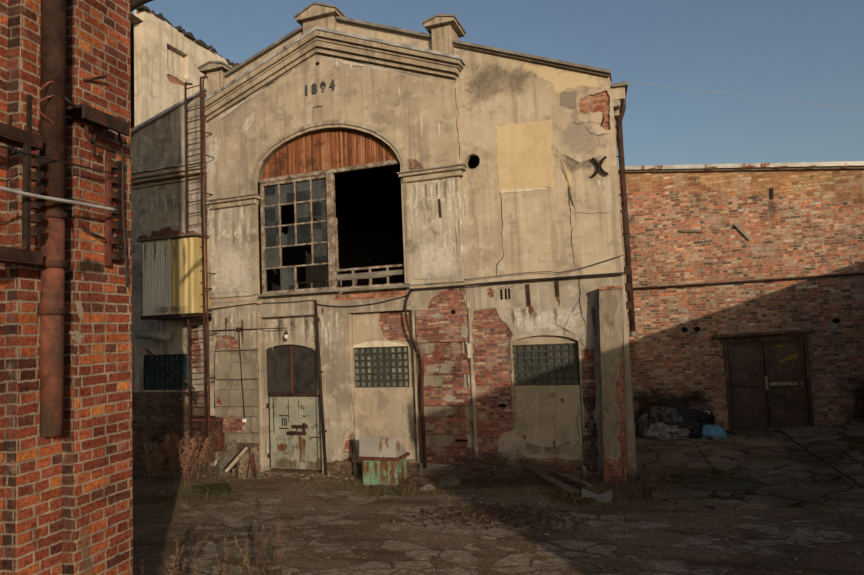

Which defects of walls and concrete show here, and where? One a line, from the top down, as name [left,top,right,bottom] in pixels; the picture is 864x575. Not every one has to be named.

flaking render [578,91,611,130]
flaking render [332,288,407,300]
crack [485,194,519,289]
crack [555,148,608,347]
rust [276,399,322,469]
flaking render [379,286,516,475]
flaking render [519,343,627,485]